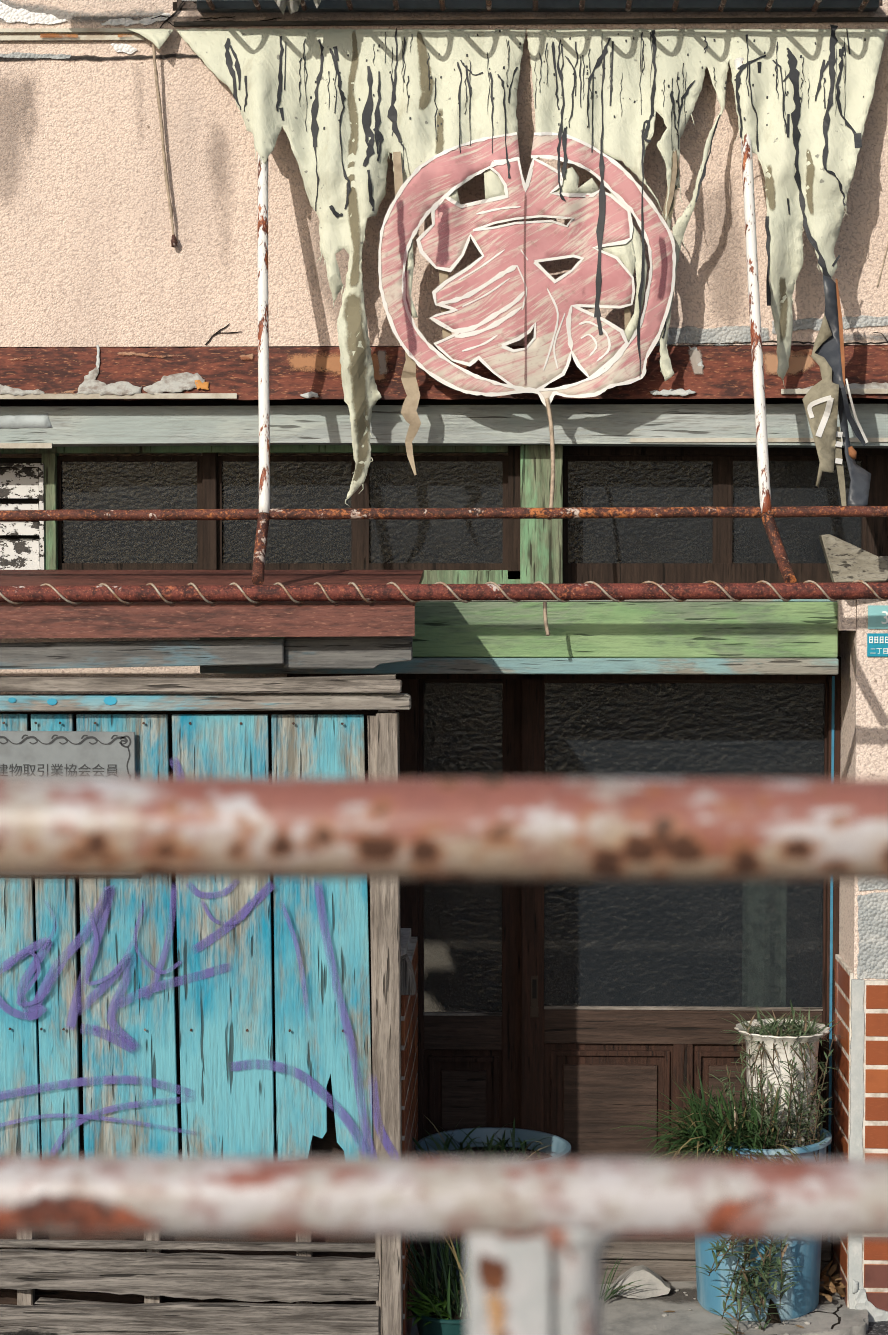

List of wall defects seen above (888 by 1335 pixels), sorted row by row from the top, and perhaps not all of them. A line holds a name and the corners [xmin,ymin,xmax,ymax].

corrosion [290,354,341,374]
corrosion [371,351,387,381]
corrosion [689,350,702,374]
corrosion [765,353,814,374]
corrosion [0,1194,163,1229]
corrosion [705,1195,776,1236]
corrosion [478,1255,508,1335]